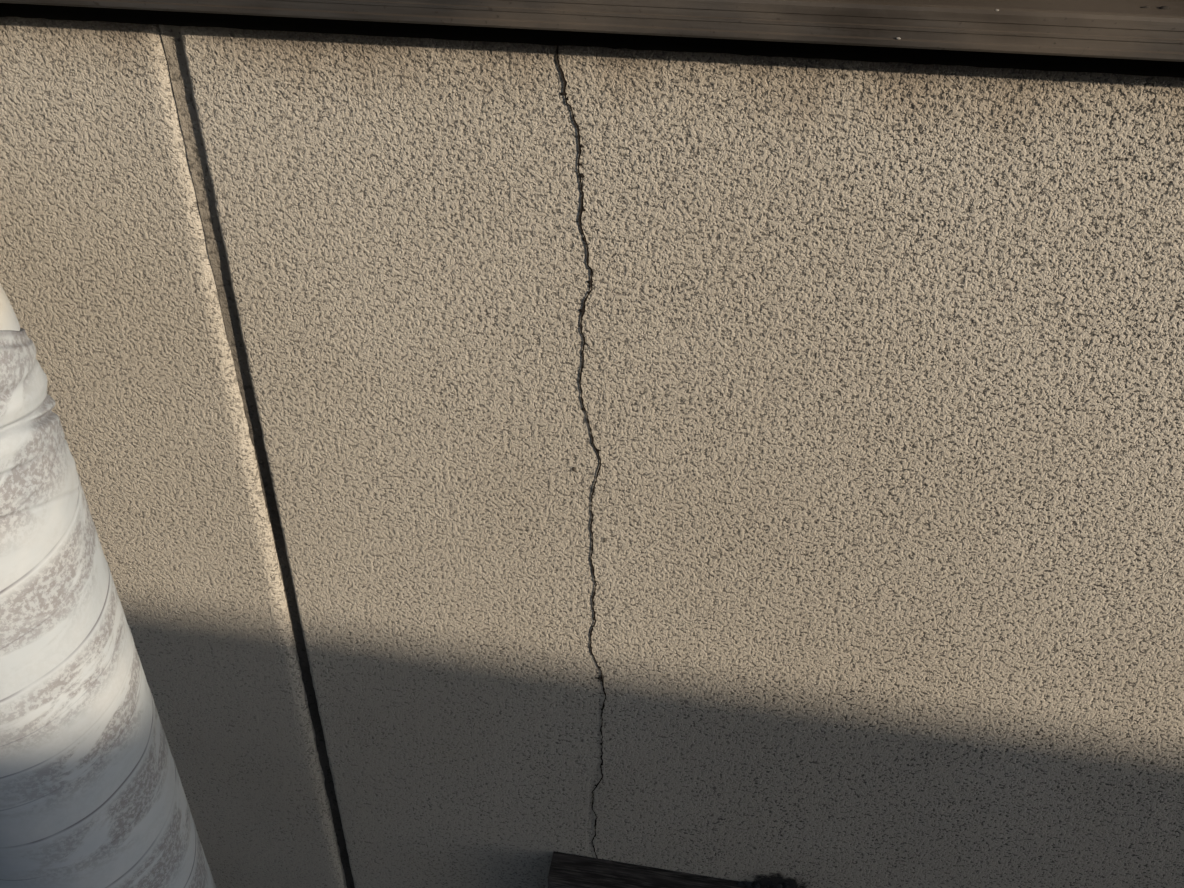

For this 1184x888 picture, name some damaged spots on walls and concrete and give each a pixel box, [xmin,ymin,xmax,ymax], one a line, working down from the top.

crack [556,46,607,858]